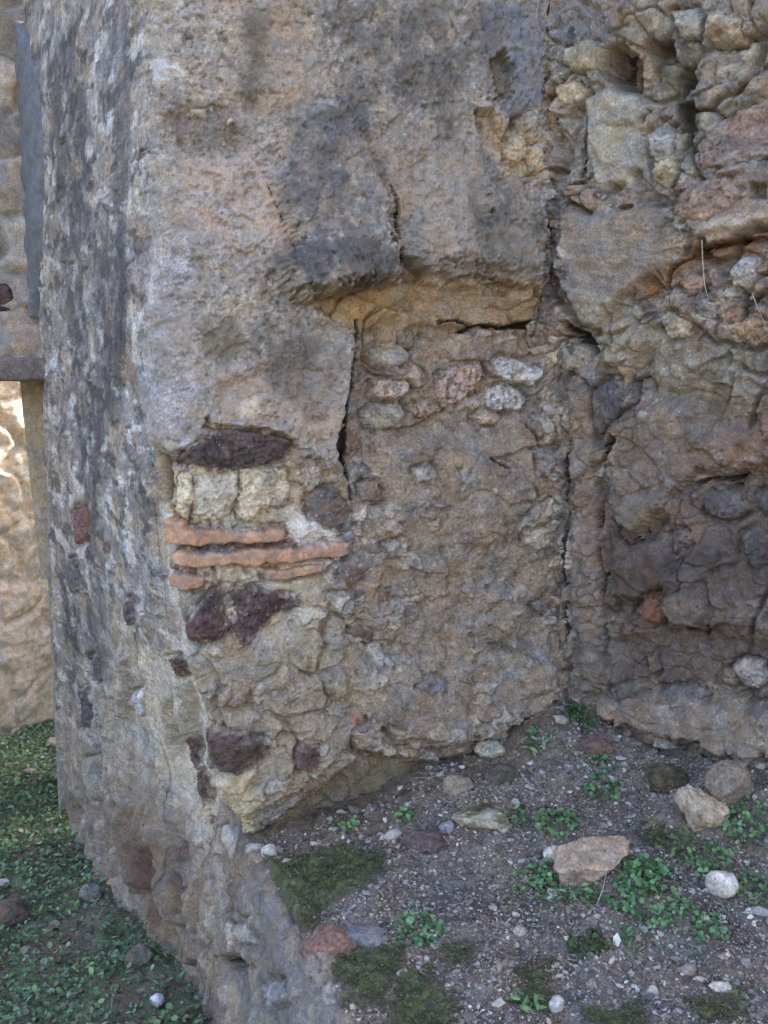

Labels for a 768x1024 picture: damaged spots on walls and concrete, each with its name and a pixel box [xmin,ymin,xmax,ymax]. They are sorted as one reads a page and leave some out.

crack [439,320,531,333]
crack [566,323,600,350]
crack [336,369,352,500]
crack [560,441,572,644]